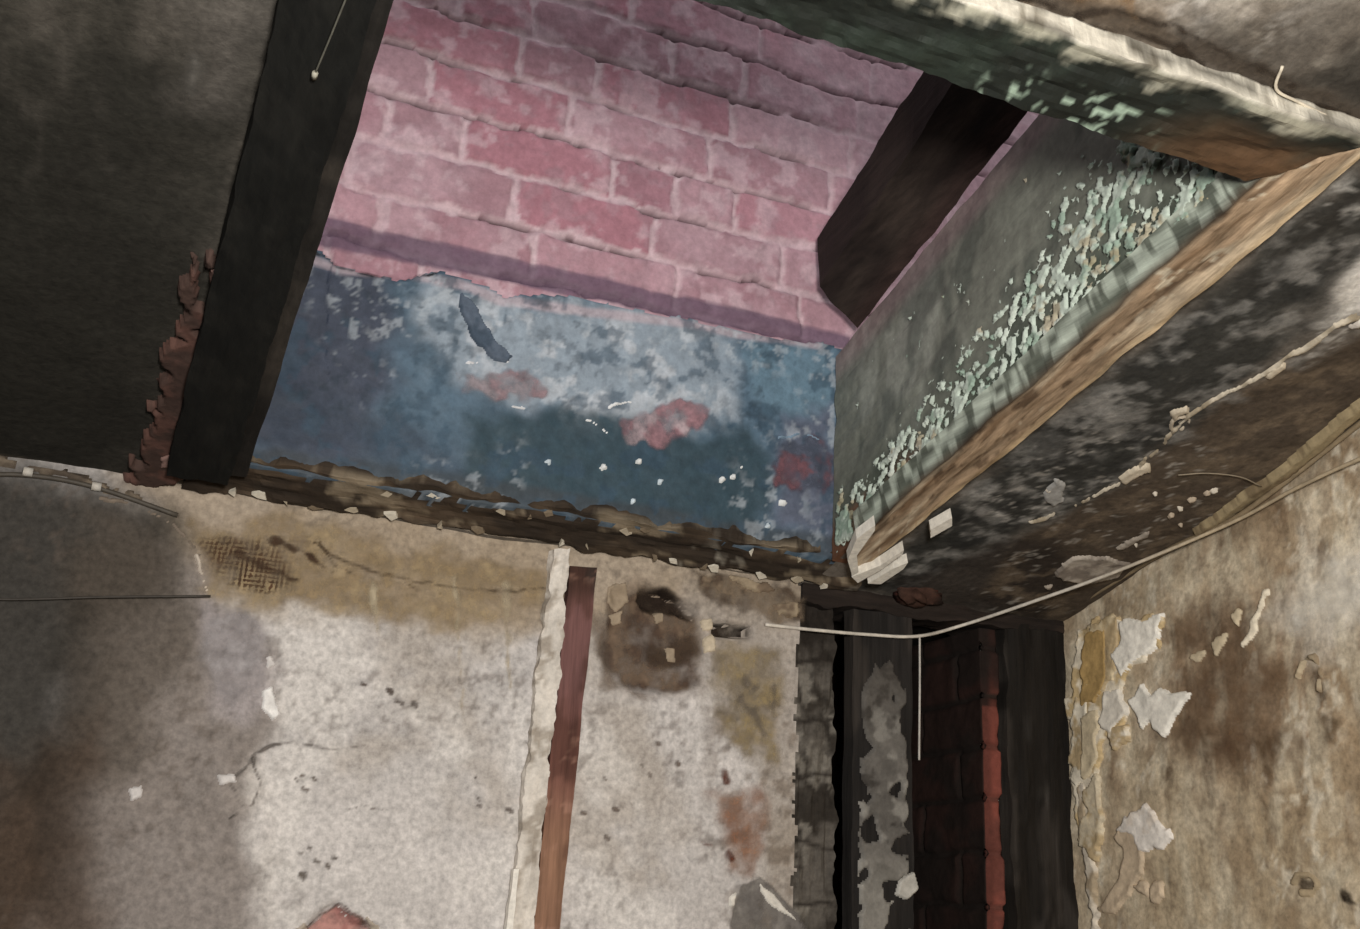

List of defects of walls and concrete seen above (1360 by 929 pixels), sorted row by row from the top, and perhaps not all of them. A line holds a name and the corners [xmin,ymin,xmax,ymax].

flaking render [123,248,216,488]
peeling [608,399,707,464]
peeling [148,511,208,591]
peeling [1064,613,1192,929]
flaking render [296,906,380,929]